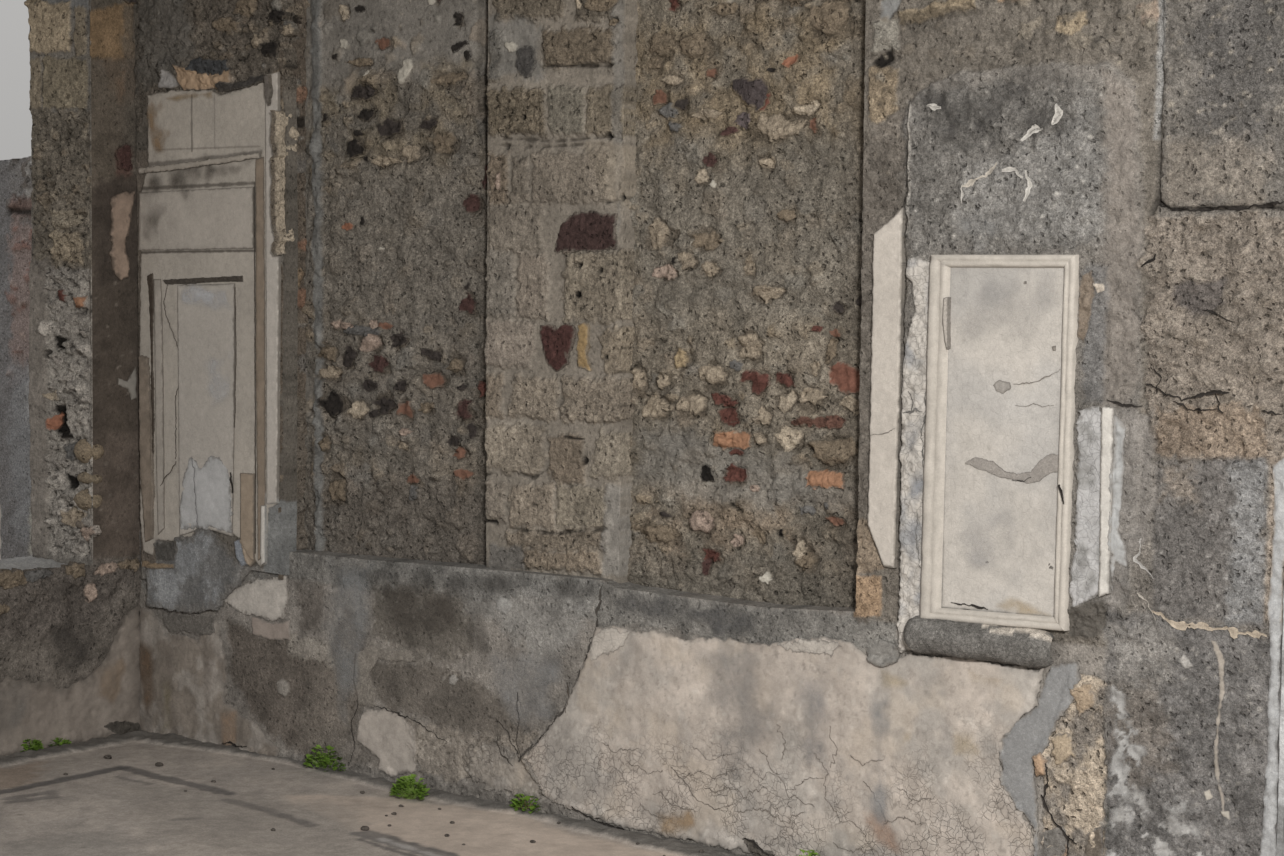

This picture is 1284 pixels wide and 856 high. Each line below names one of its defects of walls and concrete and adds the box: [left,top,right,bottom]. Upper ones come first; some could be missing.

crack [1160,201,1284,211]
crack [1107,368,1230,413]
flaking render [0,605,280,757]
crack [348,705,447,766]
crack [496,585,603,766]
crack [571,725,935,856]
flaking render [461,625,1108,856]